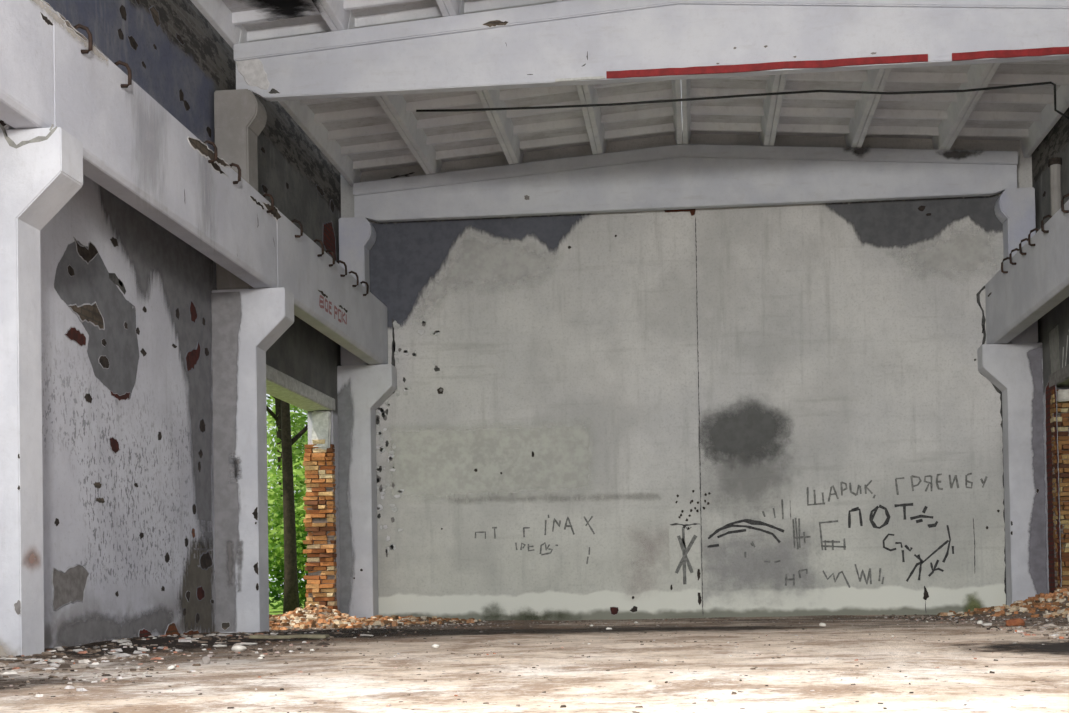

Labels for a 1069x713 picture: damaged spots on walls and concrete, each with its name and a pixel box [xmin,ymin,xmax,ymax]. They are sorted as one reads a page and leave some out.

peeling [54,236,147,402]
flaking render [51,564,89,611]